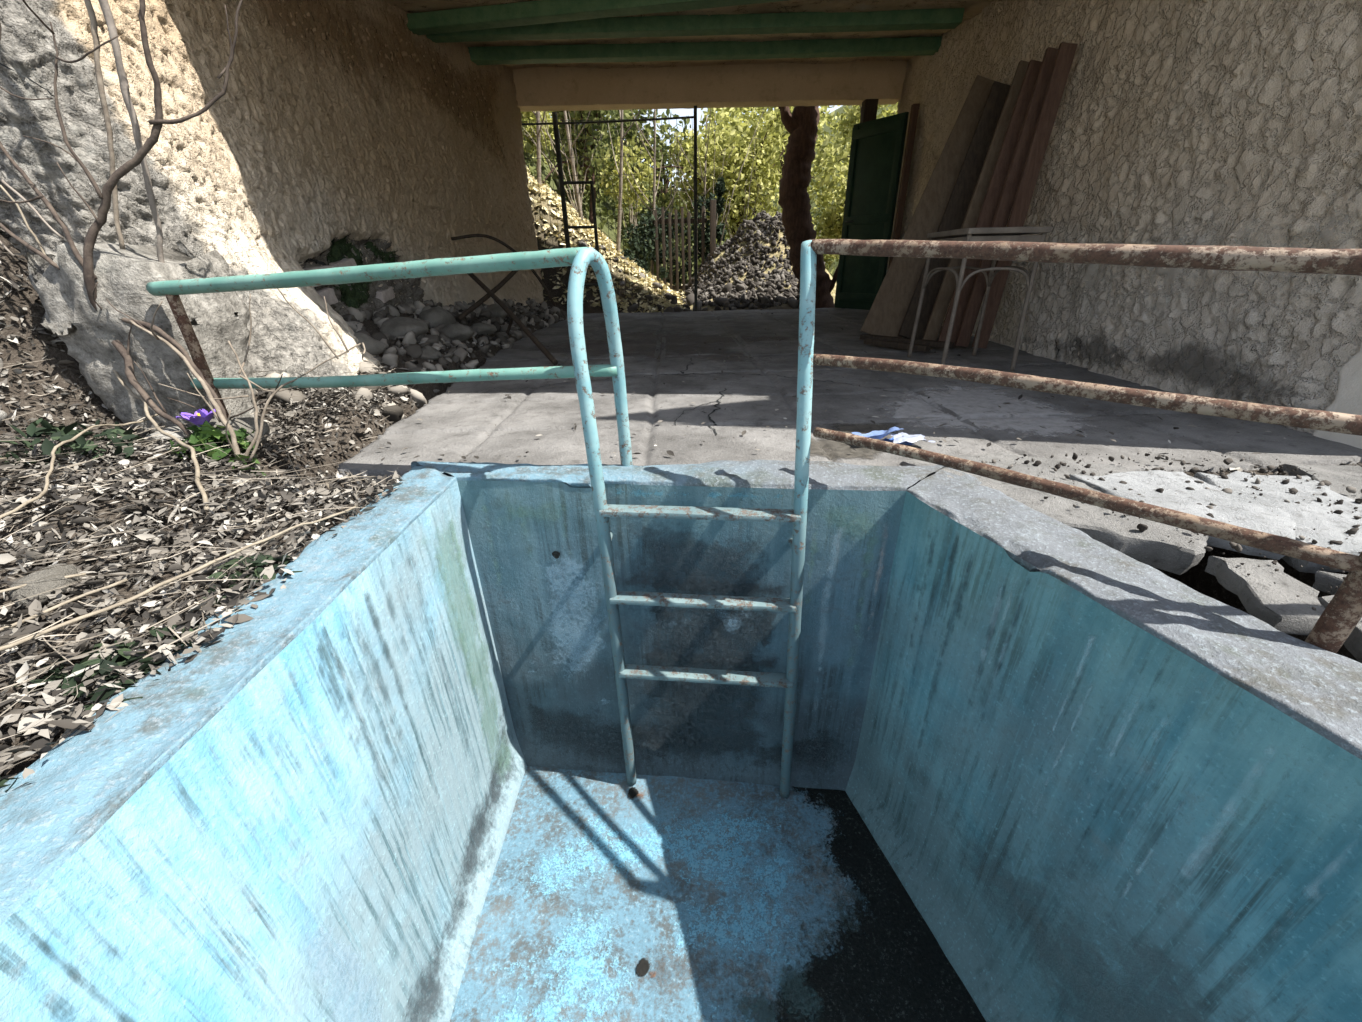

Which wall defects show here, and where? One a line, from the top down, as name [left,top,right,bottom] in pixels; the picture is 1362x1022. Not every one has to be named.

crack [469,352,905,435]
leakage [532,527,834,768]
leakage [406,728,512,1022]
leakage [732,786,986,1022]